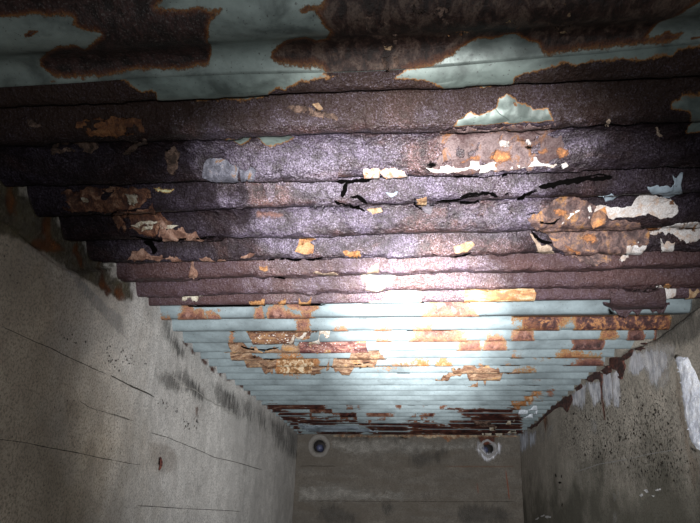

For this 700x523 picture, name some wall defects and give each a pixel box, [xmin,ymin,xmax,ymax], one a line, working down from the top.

rust [0,0,222,81]
rust [271,0,700,72]
peeling [426,161,502,174]
peeling [511,157,568,169]
peeling [562,172,700,252]
rust [249,298,319,332]
crack [5,328,154,397]
rust [267,284,672,444]
efflorescence [573,371,620,407]
efflorescence [630,345,700,450]
crack [0,439,139,465]
crack [152,433,261,470]